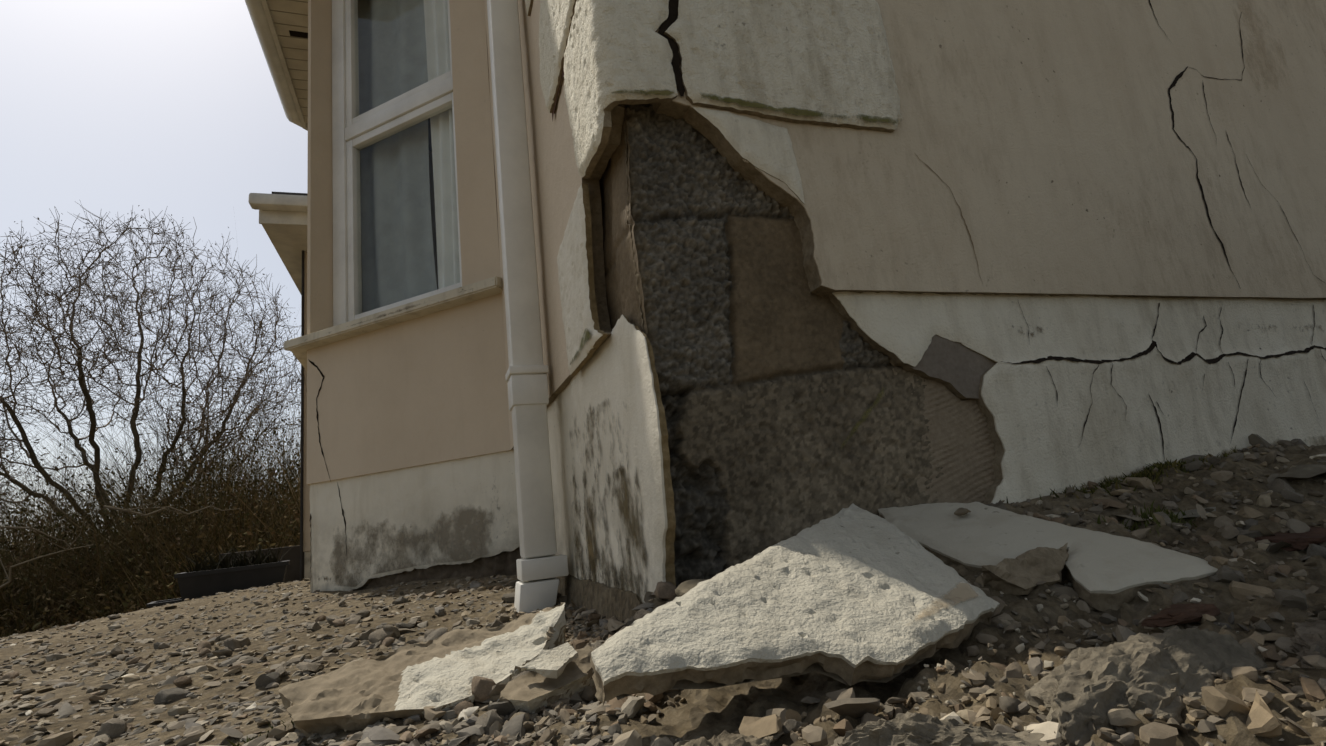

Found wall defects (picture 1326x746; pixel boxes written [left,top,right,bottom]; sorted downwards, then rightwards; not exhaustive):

crack [658,0,685,96]
crack [1001,0,1326,460]
spalling [599,104,996,588]
crack [308,359,347,580]
damp [324,509,489,587]
damp [573,467,647,600]